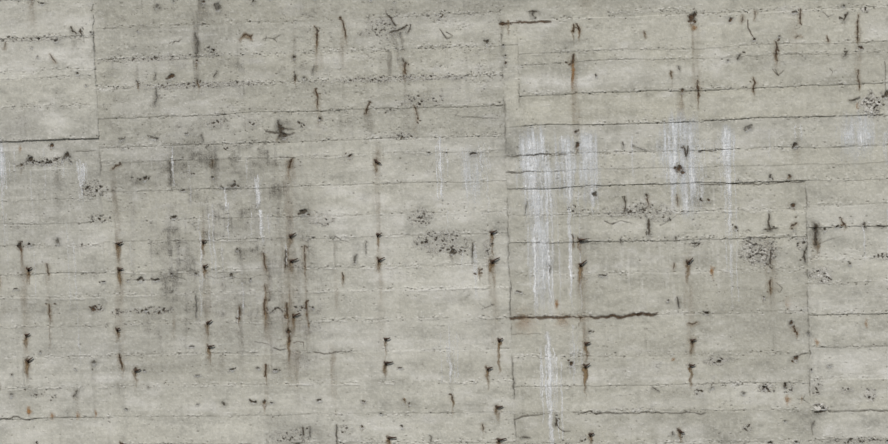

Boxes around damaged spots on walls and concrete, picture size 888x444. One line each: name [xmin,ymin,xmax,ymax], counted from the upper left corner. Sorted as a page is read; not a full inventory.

efflorescence [520,131,598,306]
efflorescence [663,118,699,207]
efflorescence [713,128,738,230]
efflorescence [540,332,583,440]